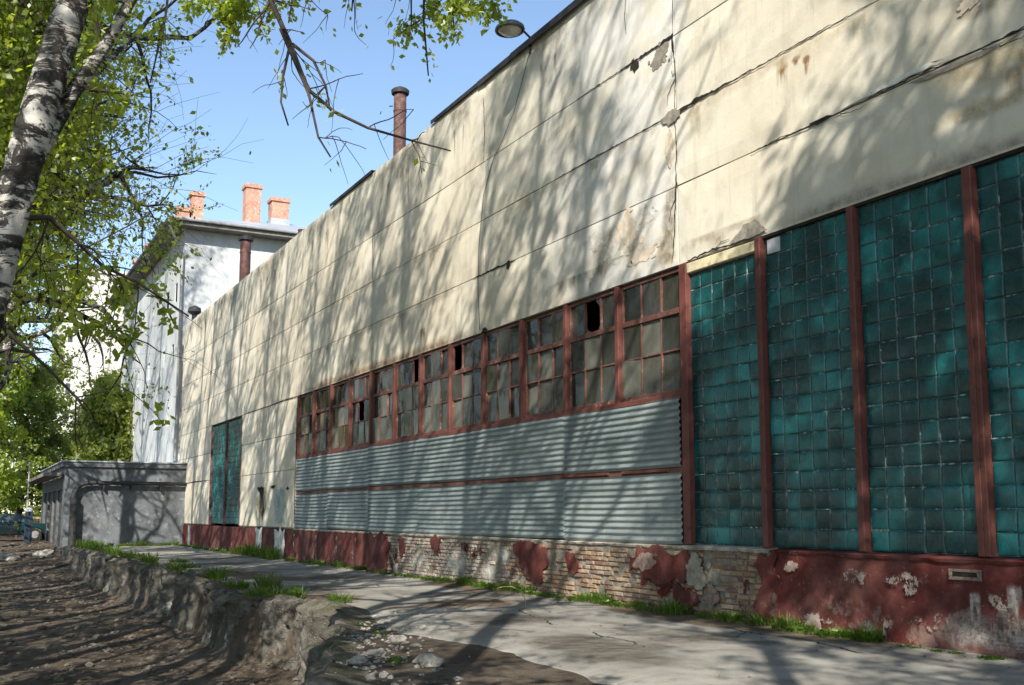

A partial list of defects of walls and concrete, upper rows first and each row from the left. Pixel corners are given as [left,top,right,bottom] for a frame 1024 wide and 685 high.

spalling [630,41,672,72]
crack [751,26,1024,153]
peeling [661,108,680,168]
crack [551,0,872,261]
peeling [582,203,660,267]
spalling [728,219,767,245]
spalling [630,550,657,571]
spalling [686,552,711,590]
peeling [784,560,798,572]
peeling [843,568,866,585]
peeling [886,572,919,595]